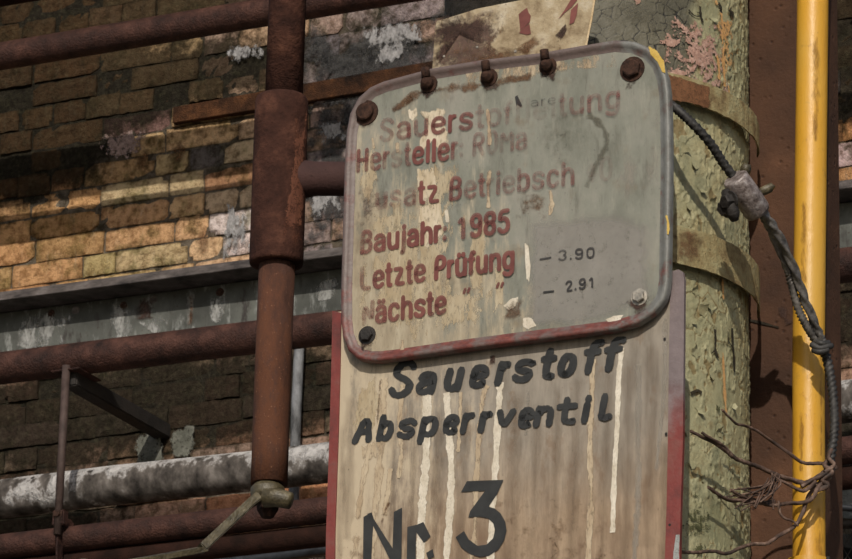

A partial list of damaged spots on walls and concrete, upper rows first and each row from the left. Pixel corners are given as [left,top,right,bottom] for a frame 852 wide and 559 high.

efflorescence [363,23,421,63]
peeling [660,0,734,93]
spalling [683,492,711,556]